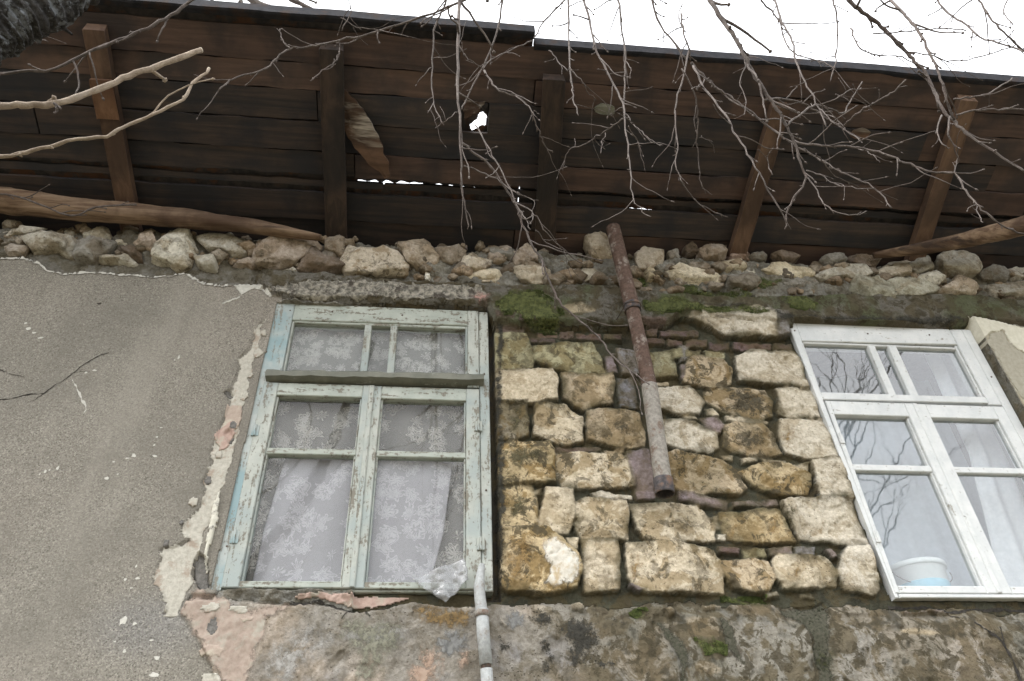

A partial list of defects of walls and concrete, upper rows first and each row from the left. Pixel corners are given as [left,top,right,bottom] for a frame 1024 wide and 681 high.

crack [0,352,109,402]
flaking render [124,315,409,681]